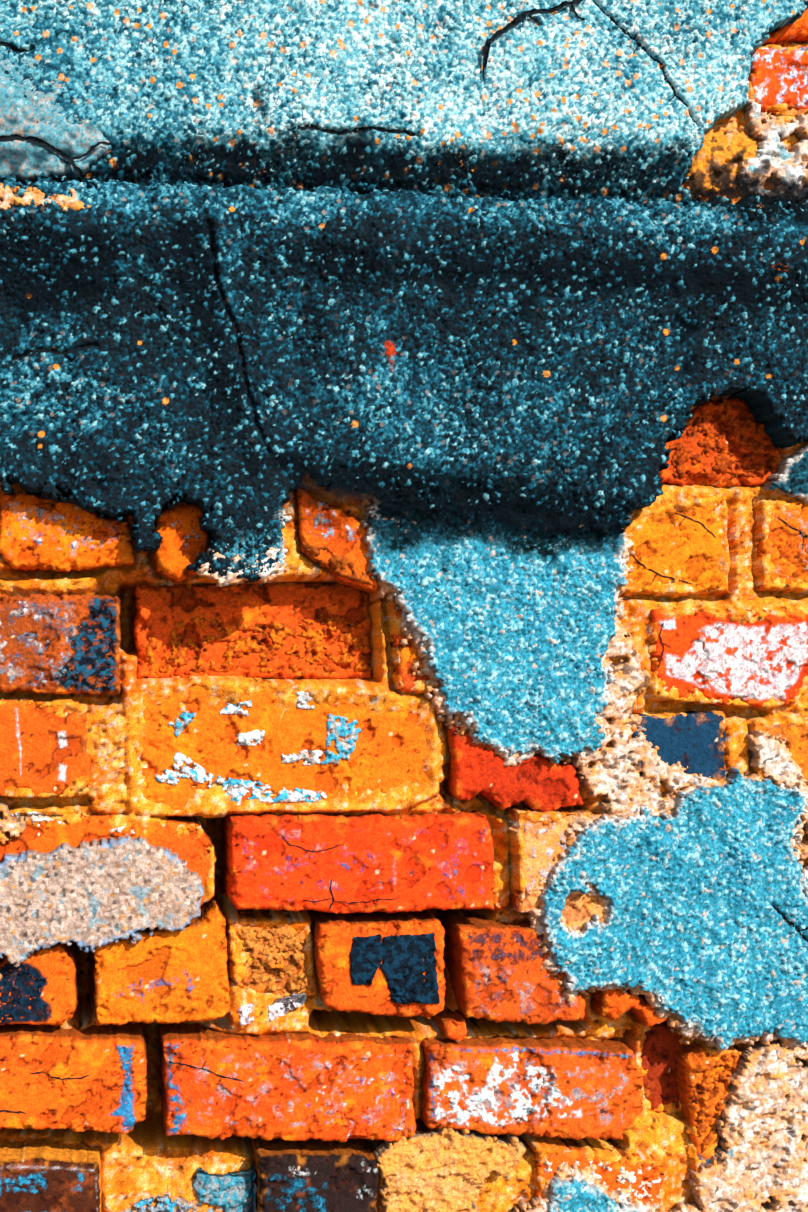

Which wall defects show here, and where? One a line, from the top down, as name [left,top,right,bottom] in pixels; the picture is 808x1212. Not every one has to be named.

crack [0,41,33,53]
crack [482,0,697,124]
crack [206,223,268,449]
peeling [0,598,117,691]
peeling [665,623,808,700]
peeling [155,752,327,805]
peeling [281,714,362,766]
flaking render [0,802,204,1024]
peeling [350,933,440,1004]
peeling [111,1046,135,1130]
peeling [429,1047,628,1126]
peeling [121,1165,327,1212]